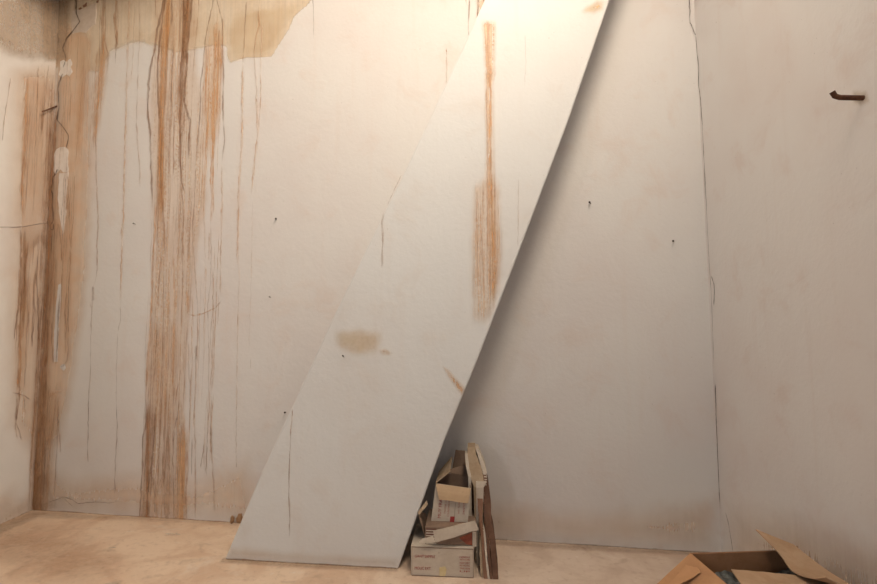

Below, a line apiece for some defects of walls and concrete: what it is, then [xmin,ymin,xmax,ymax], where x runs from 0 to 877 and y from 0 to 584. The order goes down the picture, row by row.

crack [56,0,80,147]
damp [56,0,310,70]
rust [147,0,225,208]
rust [484,24,492,135]
crack [1,170,57,248]
rust [25,2,107,510]
crack [713,386,721,497]